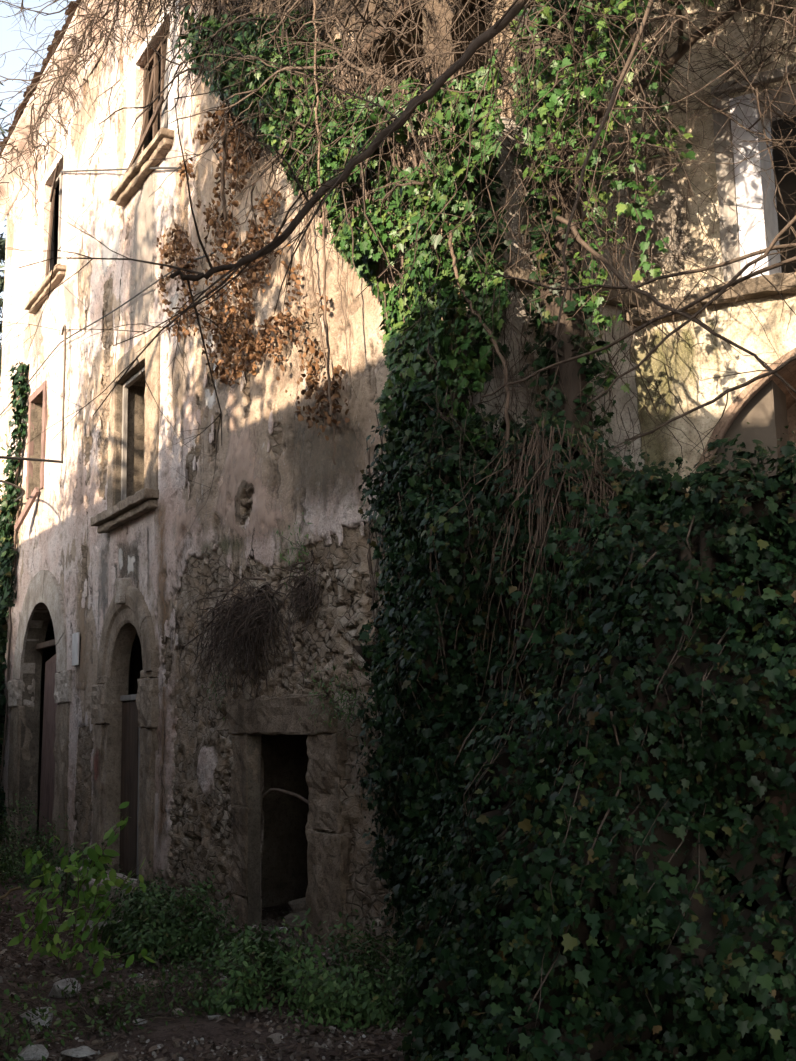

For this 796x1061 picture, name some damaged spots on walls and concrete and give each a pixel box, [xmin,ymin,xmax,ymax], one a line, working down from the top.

spalling [240,483,258,536]
spalling [161,520,407,968]